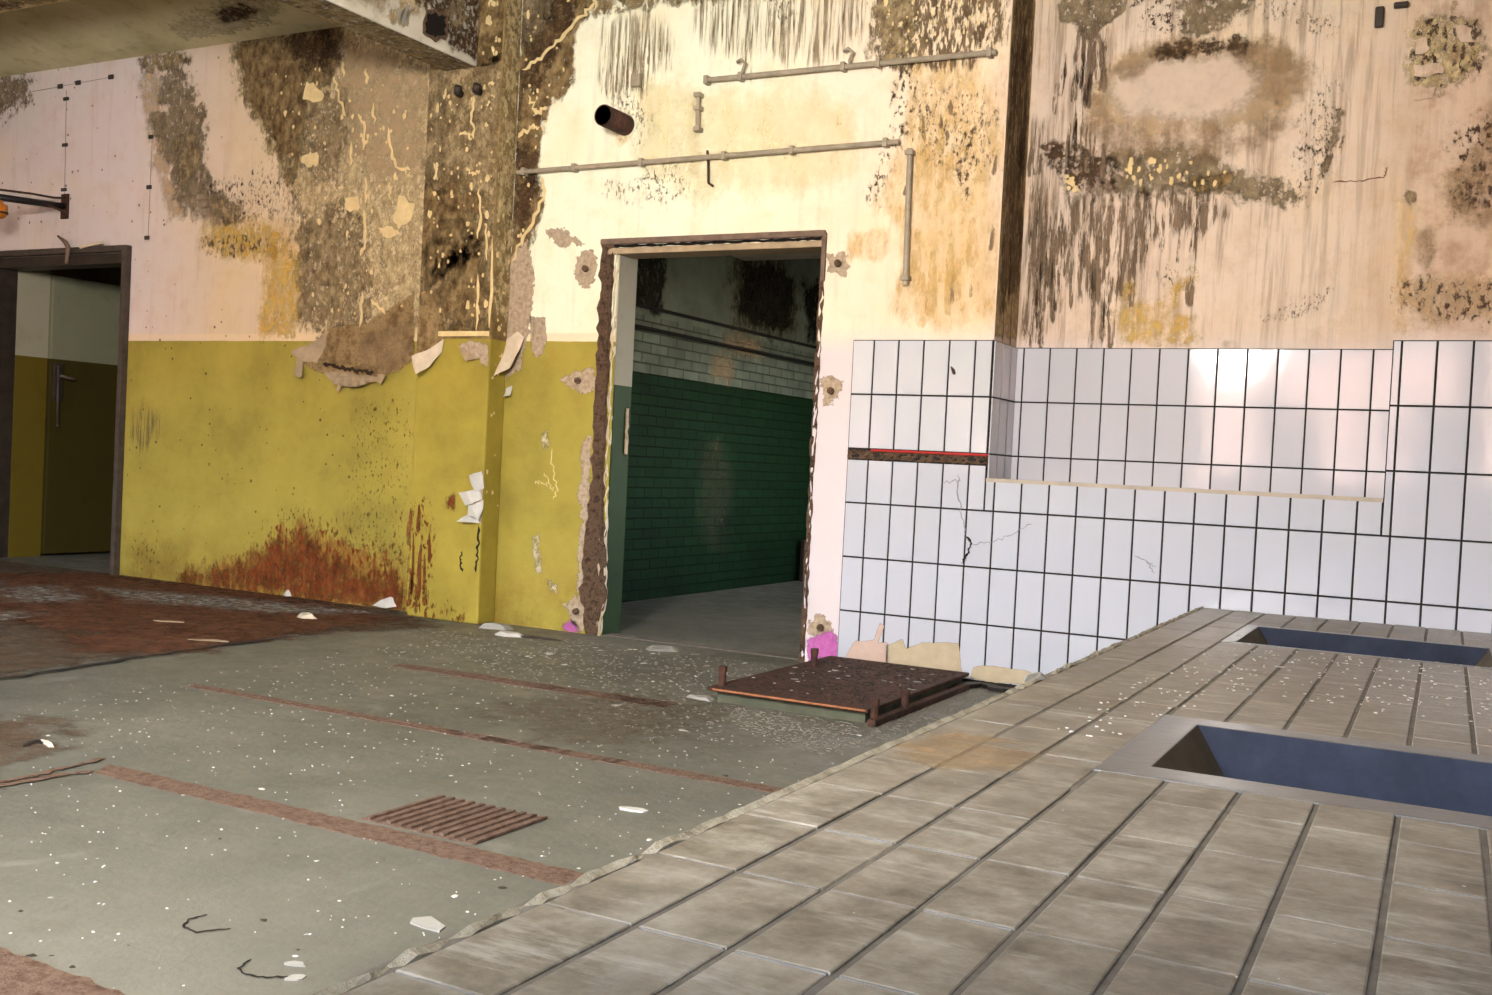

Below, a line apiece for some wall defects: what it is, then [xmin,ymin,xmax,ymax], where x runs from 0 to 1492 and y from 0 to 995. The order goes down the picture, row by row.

damp [138,0,1344,348]
damp [1449,122,1492,224]
peeling [291,240,547,397]
flaking render [545,227,598,289]
damp [714,258,819,381]
damp [1400,233,1492,324]
flaking render [560,367,596,394]
crack [942,476,1031,564]
rust [0,498,465,676]
spalling [845,624,1030,684]